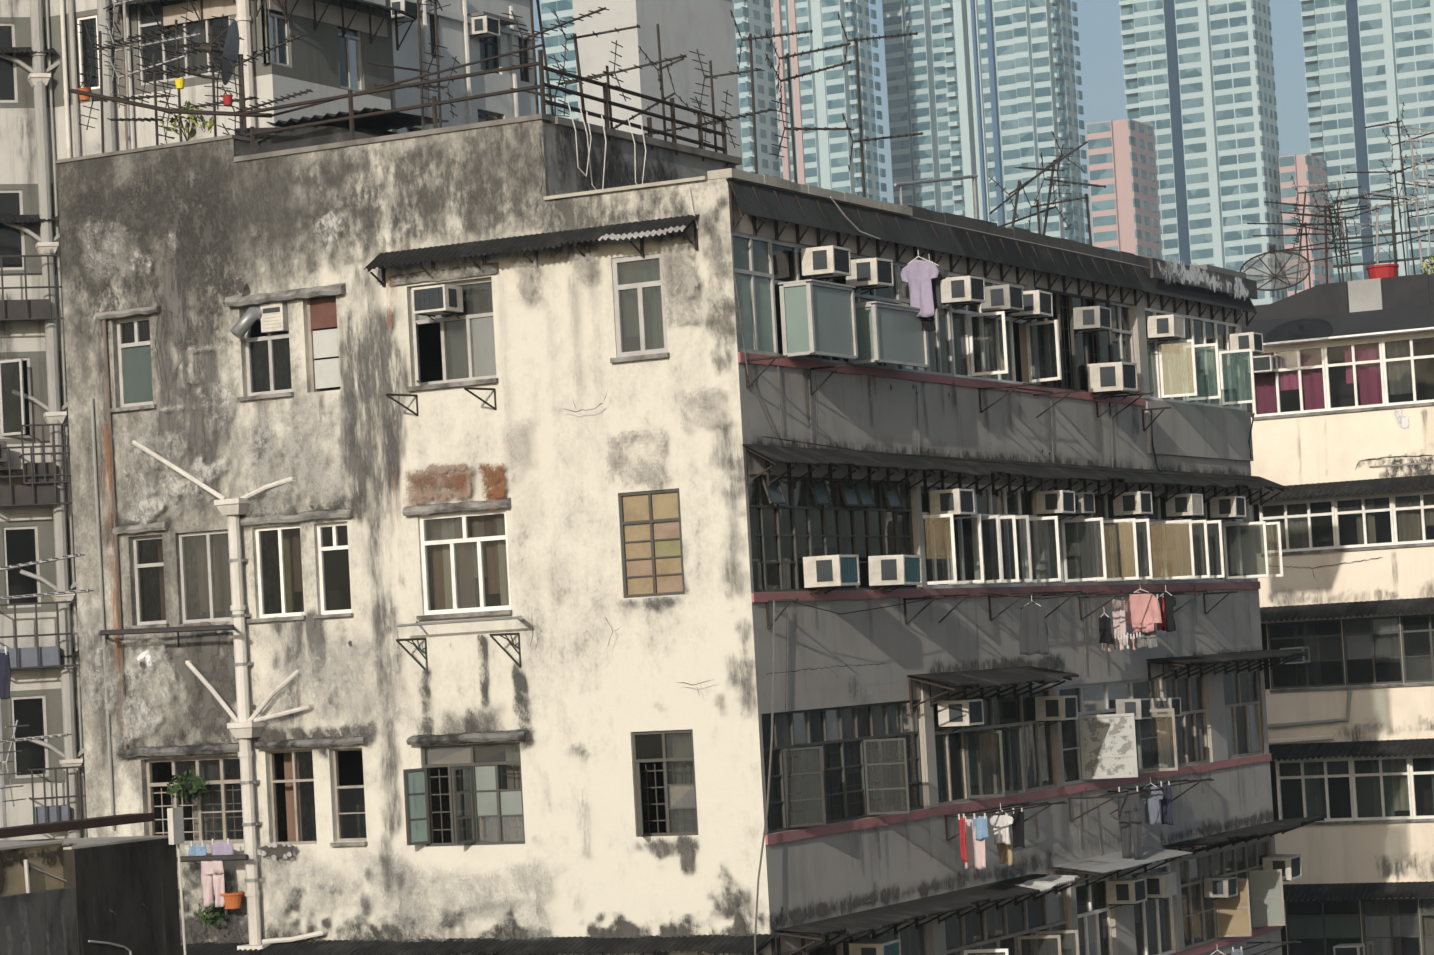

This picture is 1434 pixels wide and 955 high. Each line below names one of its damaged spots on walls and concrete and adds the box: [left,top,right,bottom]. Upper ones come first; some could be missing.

leakage [393,122,687,258]
leakage [704,199,726,274]
leakage [70,141,377,513]
leakage [340,303,408,577]
leakage [88,635,134,741]
leakage [166,622,237,744]
leakage [374,595,398,698]
leakage [731,662,754,708]
leakage [366,719,402,892]
leakage [652,835,694,873]
leakage [1378,858,1434,877]
leakage [386,909,558,955]